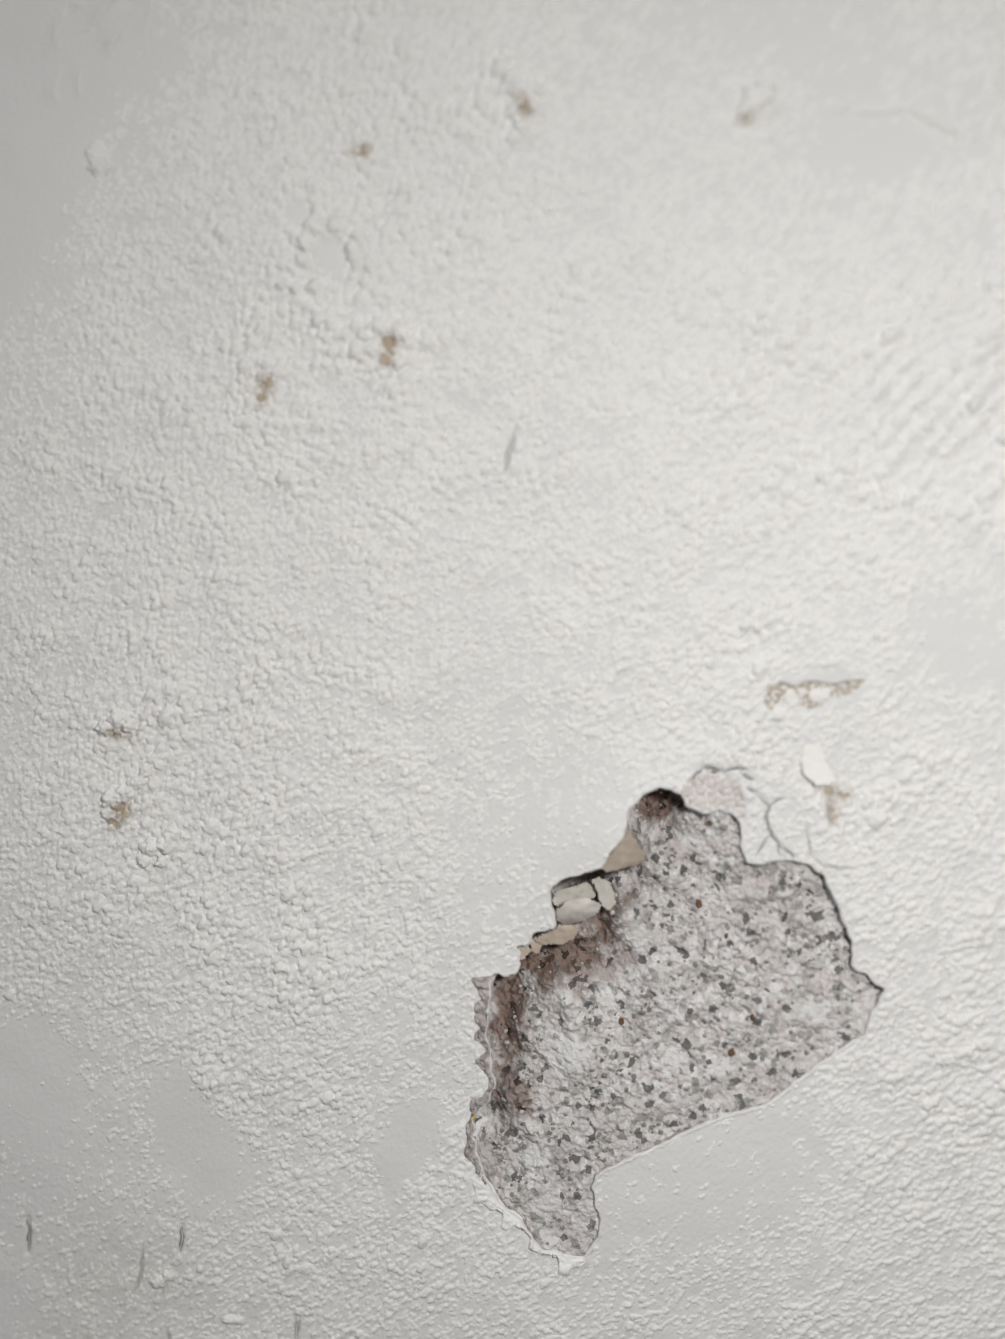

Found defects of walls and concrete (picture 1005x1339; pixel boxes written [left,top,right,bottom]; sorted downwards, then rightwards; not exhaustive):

spalling [464,768,889,1276]